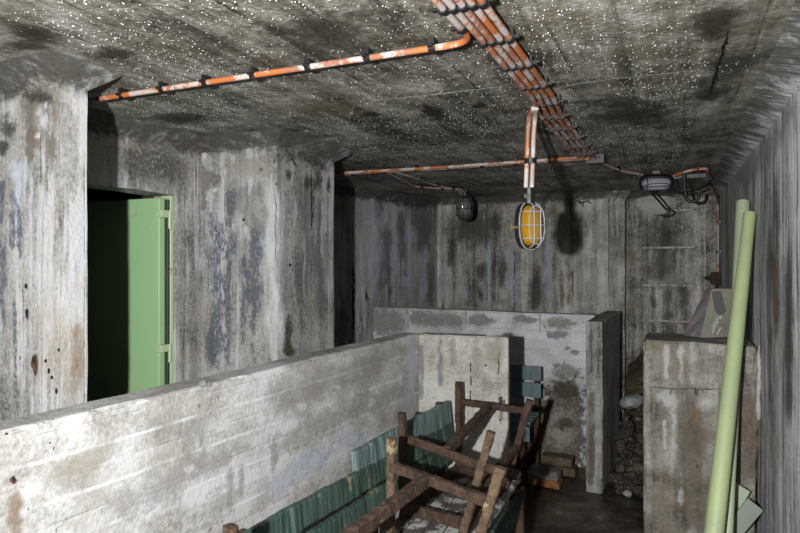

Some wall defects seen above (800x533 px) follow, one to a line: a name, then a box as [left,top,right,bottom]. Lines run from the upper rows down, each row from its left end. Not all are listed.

damp [12,25,57,49]
damp [694,8,734,39]
damp [97,48,132,59]
crack [709,30,729,96]
damp [152,114,203,124]
damp [262,185,282,347]
damp [366,199,517,304]